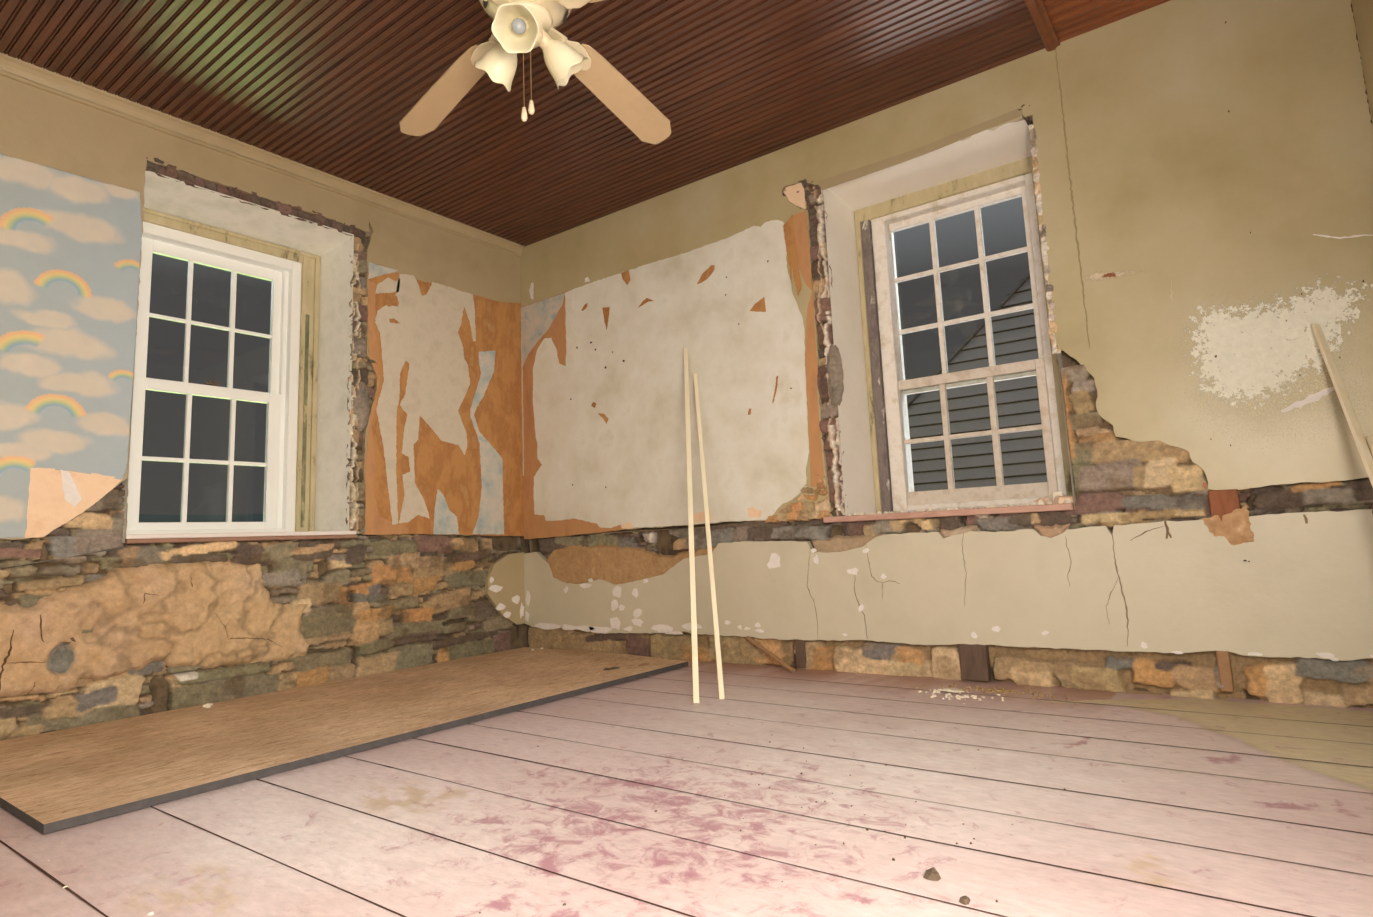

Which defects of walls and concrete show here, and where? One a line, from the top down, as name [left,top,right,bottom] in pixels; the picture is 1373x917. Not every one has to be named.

flaking render [0,104,1373,741]
crack [1106,521,1172,646]